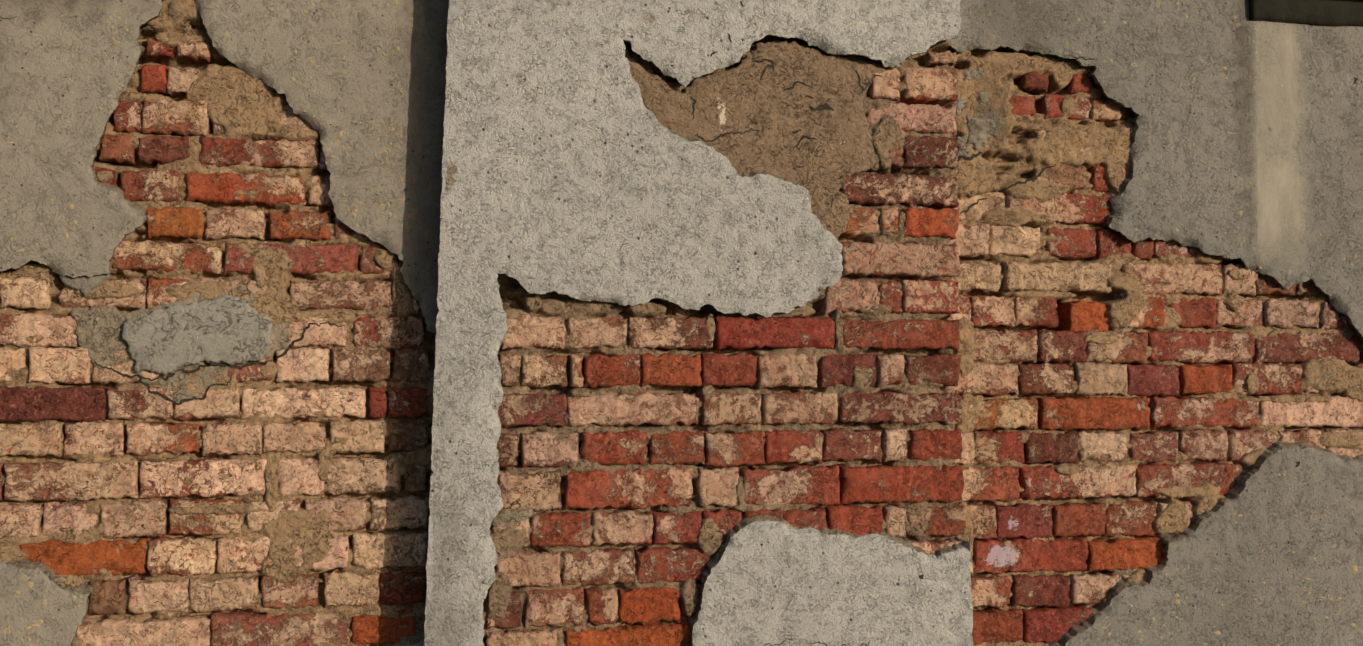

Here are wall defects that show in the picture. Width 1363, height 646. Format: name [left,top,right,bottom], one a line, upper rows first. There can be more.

spalling [0,0,436,646]
spalling [482,35,1363,646]